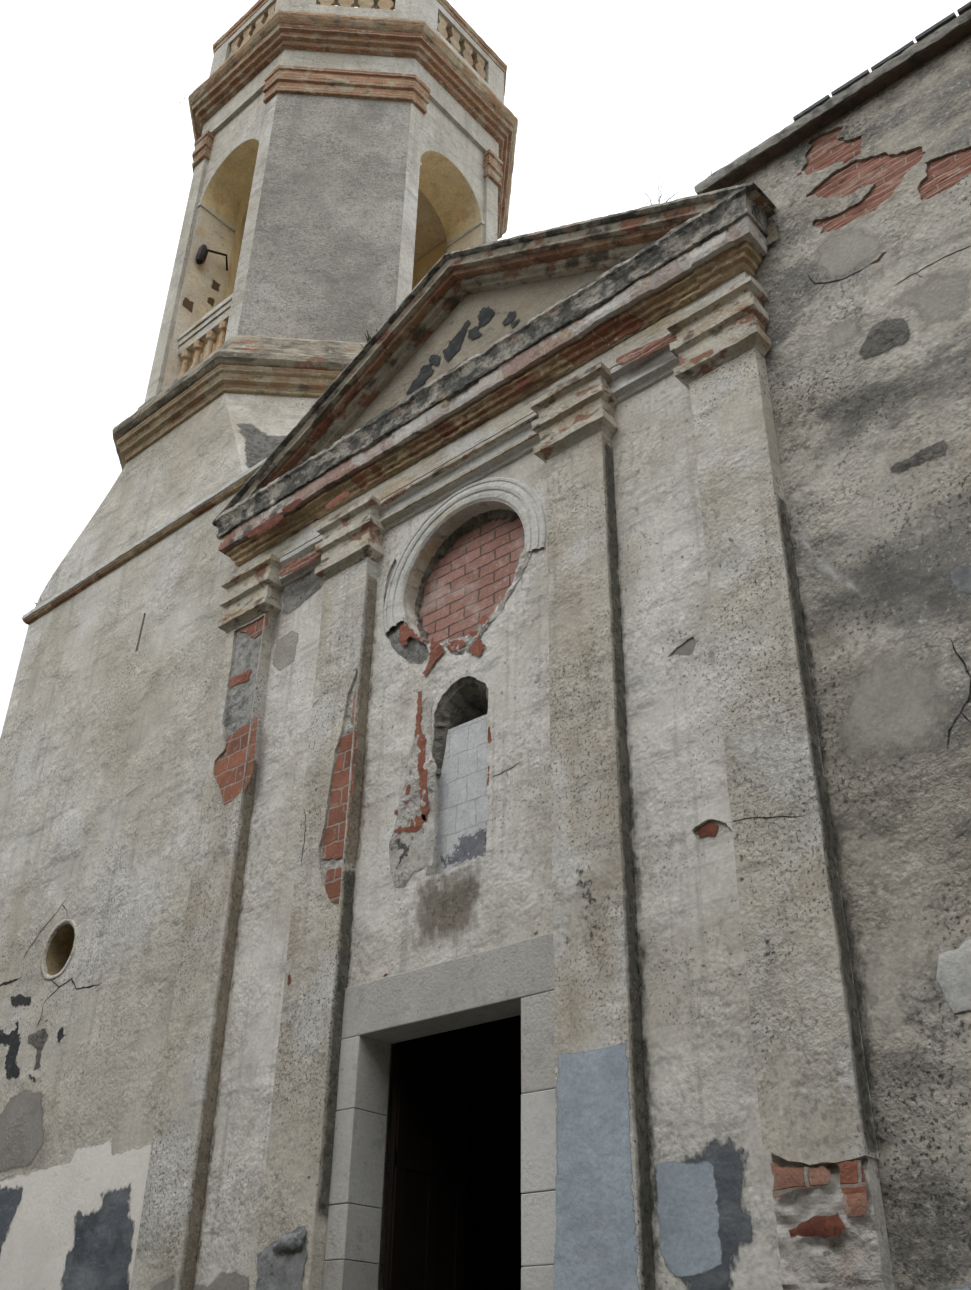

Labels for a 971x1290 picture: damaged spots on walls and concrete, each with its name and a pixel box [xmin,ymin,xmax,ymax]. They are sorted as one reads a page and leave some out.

flaking render [797,128,971,232]
flaking render [406,306,520,394]
flaking render [386,509,533,675]
flaking render [214,551,323,805]
crack [947,638,971,748]
flaking render [320,673,359,908]
flaking render [389,691,437,887]
leakage [417,829,487,939]
flaking render [694,820,733,844]
crack [36,978,101,1028]
spalling [771,1153,895,1290]